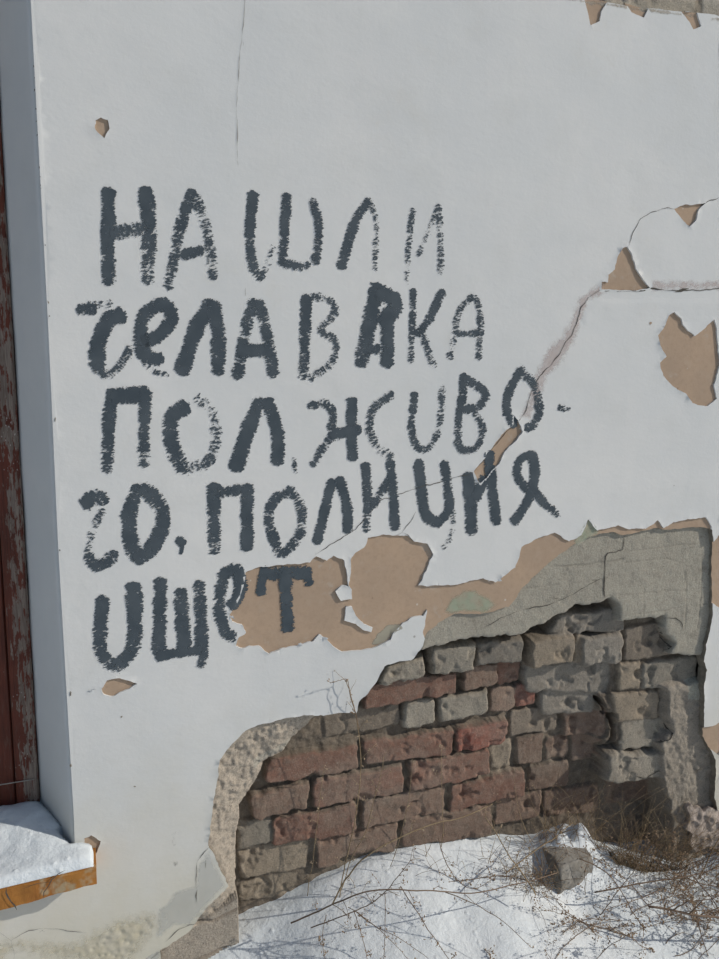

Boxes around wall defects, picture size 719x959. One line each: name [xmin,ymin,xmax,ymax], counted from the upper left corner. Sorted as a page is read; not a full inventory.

peeling [585,0,607,25]
peeling [624,3,646,17]
peeling [682,12,700,29]
peeling [95,118,109,138]
peeling [658,313,719,406]
crack [320,287,719,552]
peeling [88,678,136,696]
flaking render [160,517,719,959]